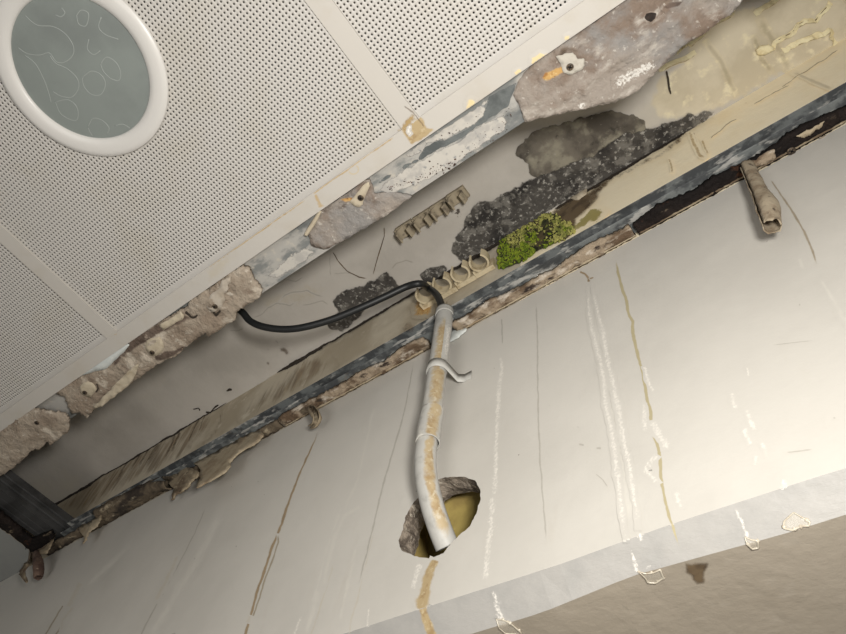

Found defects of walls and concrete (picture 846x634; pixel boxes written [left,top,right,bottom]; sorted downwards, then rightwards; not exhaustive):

leakage [610,56,662,92]
peeling [643,0,846,127]
leakage [448,95,712,261]
peeling [450,328,467,342]
corrosion [405,293,456,545]
leakage [585,256,687,575]
hole [399,499,447,558]
hole [438,477,481,537]
corrosion [408,556,448,634]